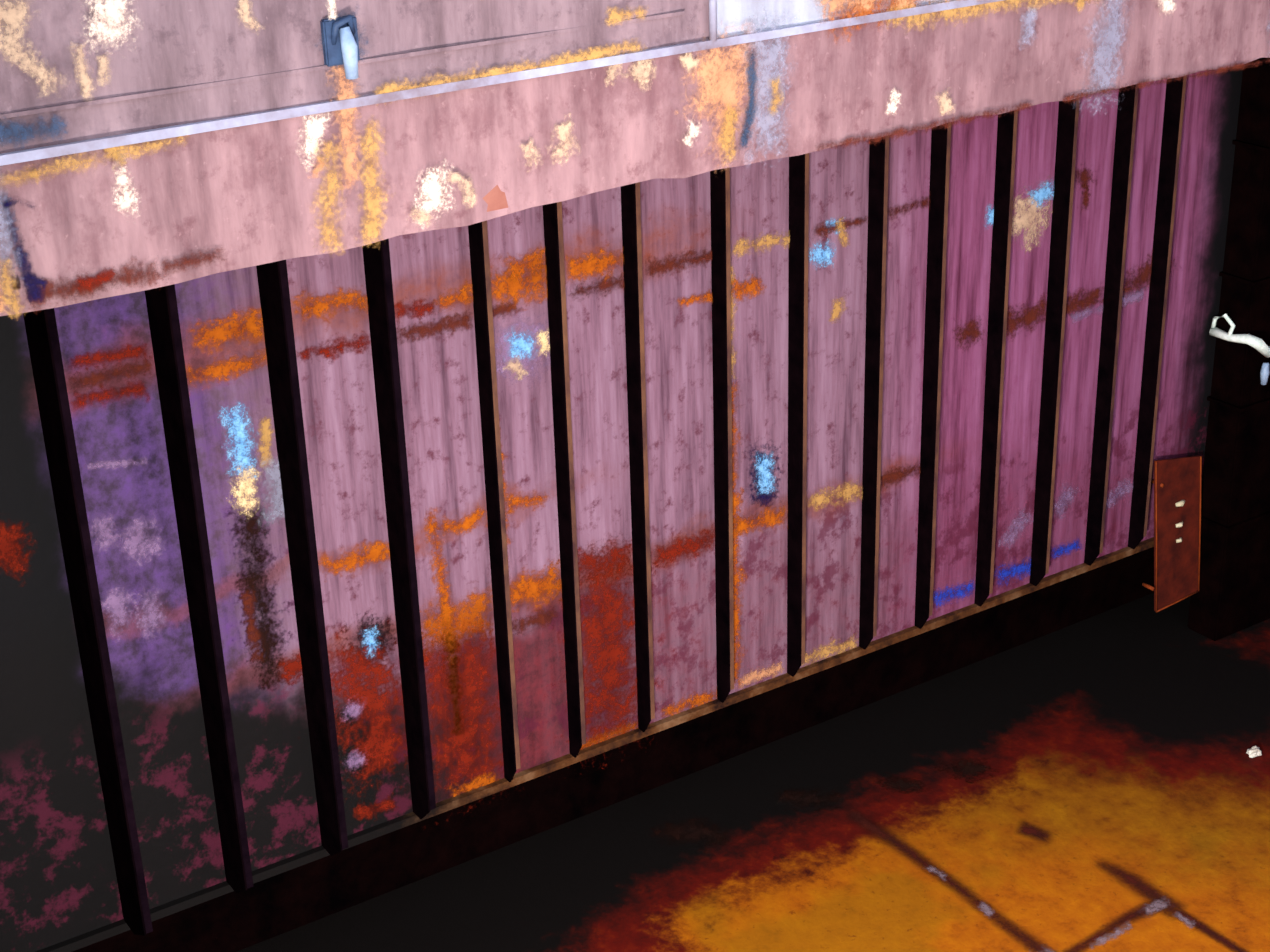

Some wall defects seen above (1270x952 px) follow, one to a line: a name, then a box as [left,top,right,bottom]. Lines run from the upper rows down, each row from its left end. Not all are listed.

peeling [0,0,57,95]
peeling [75,0,134,98]
rust [376,41,640,95]
rust [689,29,752,160]
rust [820,0,1085,35]
rust [316,67,387,251]
rust [188,309,267,383]
rust [395,285,473,341]
rust [490,249,548,317]
rust [422,509,503,797]
rust [577,540,638,750]
rust [328,634,407,786]